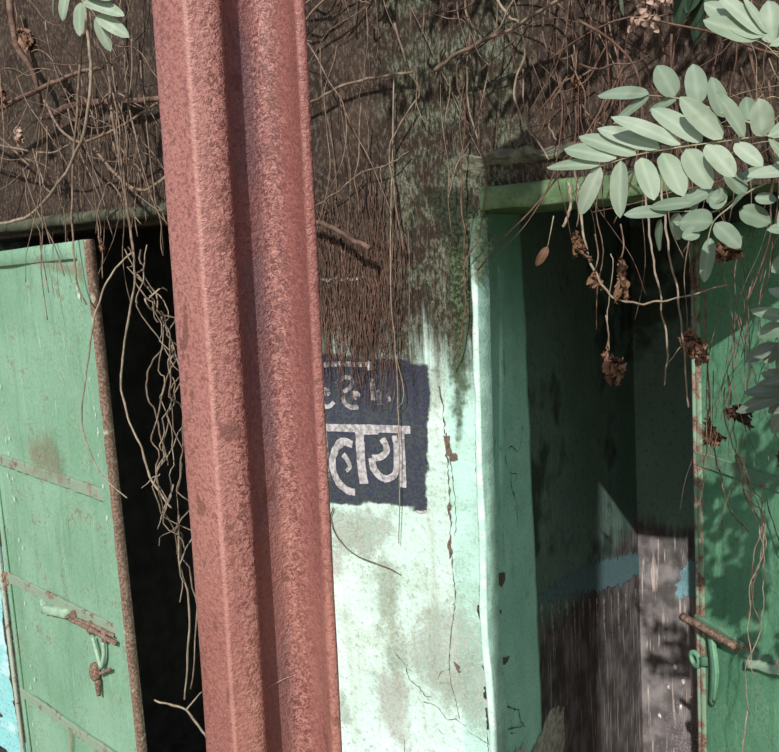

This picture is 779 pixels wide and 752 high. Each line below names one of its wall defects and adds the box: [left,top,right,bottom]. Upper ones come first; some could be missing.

spalling [443,435,458,461]
crack [475,426,523,538]
crack [396,386,490,750]
spalling [0,587,33,743]
leakage [380,562,487,733]
peeling [516,705,566,752]
leakage [666,696,698,752]